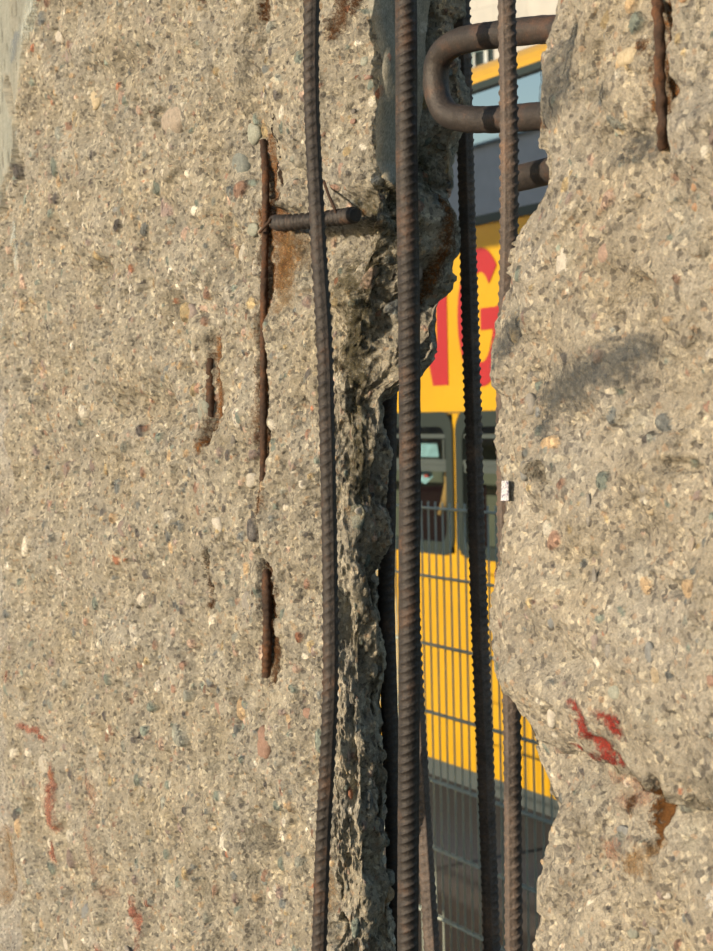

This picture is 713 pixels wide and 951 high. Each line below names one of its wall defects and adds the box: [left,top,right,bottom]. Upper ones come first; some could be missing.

rust [320,0,360,41]
rust [649,1,680,115]
rust [252,134,305,344]
rust [194,336,224,453]
rust [251,357,271,457]
spalling [0,0,523,951]
spalling [522,456,550,493]
rust [261,563,281,687]
rust [625,786,678,873]